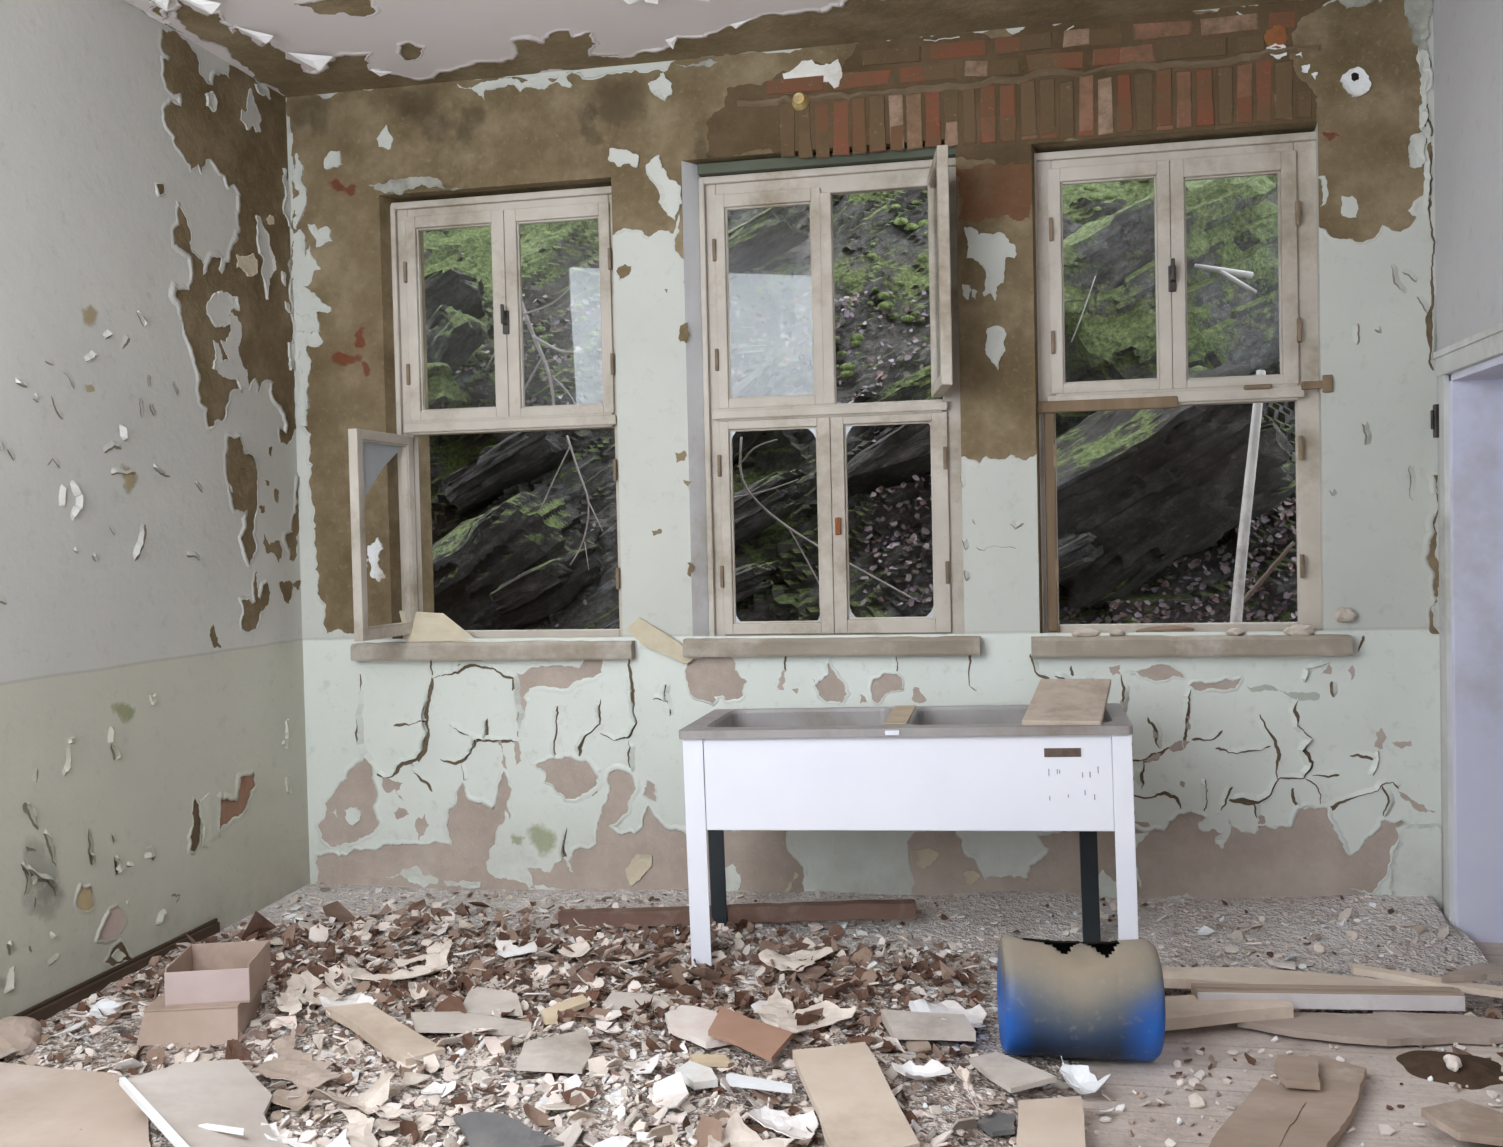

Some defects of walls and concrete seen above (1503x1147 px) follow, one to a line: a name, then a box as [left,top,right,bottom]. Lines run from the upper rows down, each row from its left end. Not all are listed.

peeling [148,0,1434,639]
crack [355,659,675,792]
peeling [683,657,750,707]
peeling [777,656,926,706]
crack [1029,635,1403,818]
peeling [1109,661,1355,701]
peeling [187,766,257,856]
peeling [312,659,689,890]
crack [559,827,567,861]
peeling [706,824,808,893]
peeling [903,823,1117,898]
peeling [1135,792,1442,901]